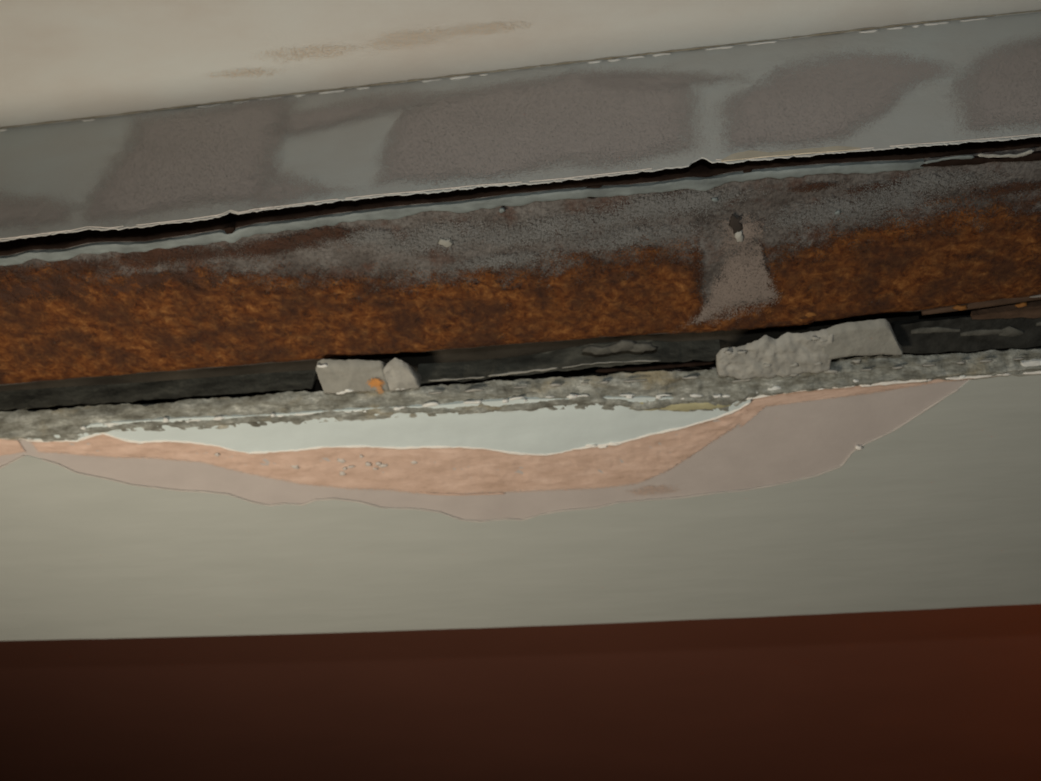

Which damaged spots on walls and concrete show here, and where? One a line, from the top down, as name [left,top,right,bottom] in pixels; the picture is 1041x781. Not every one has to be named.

rust [0,178,1041,385]
peeling [0,339,1041,522]